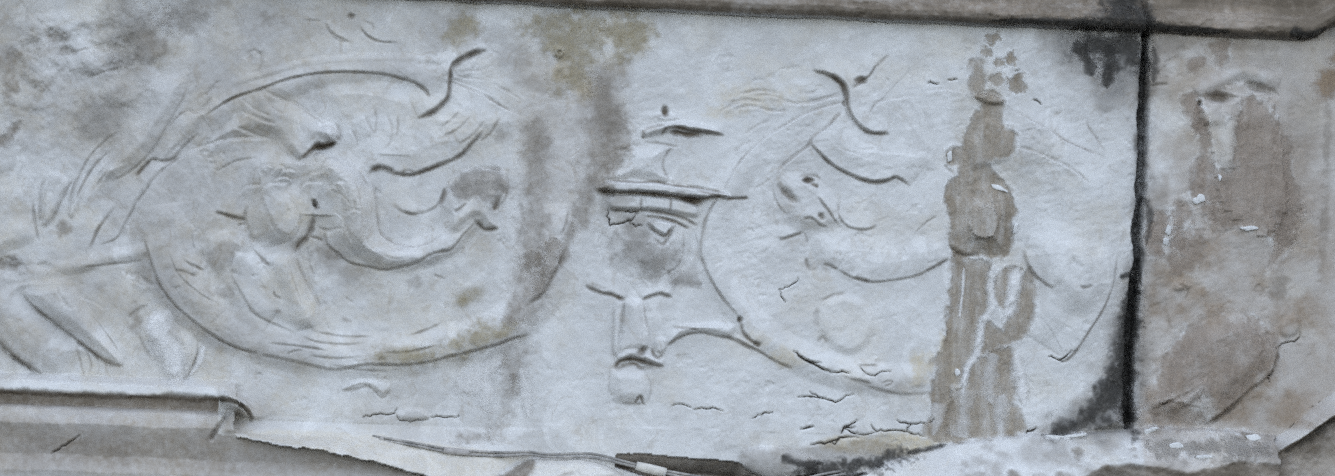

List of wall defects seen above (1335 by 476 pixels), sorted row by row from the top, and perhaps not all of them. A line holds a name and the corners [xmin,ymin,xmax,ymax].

water stain [1290,28,1327,40]
water stain [991,0,1228,441]
spalling [1146,93,1299,274]
water stain [961,266,1022,411]
peeling [1045,432,1087,452]
peeling [1144,427,1271,461]